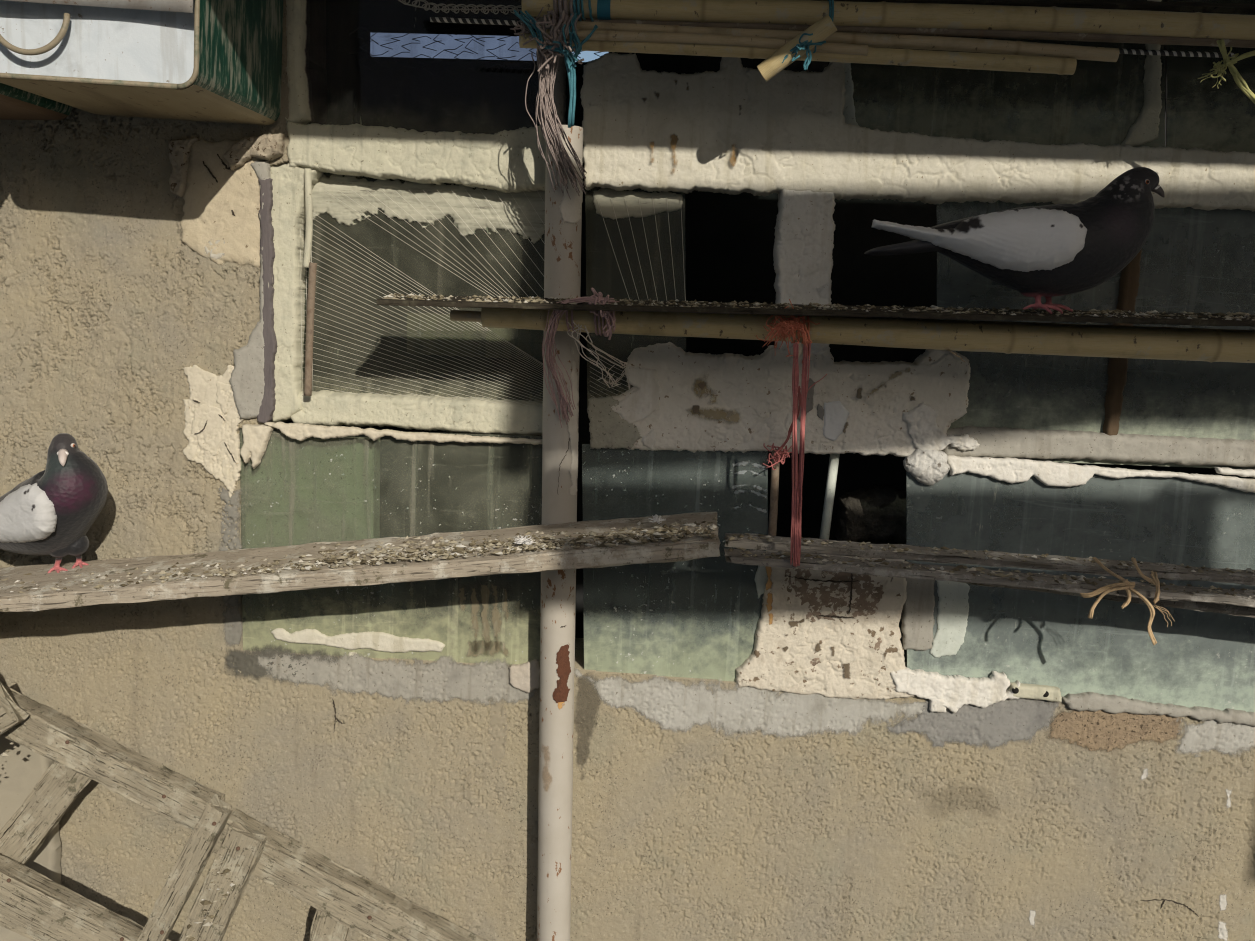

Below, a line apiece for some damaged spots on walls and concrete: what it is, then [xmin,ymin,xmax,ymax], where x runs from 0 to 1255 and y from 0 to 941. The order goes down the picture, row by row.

peeling [183,365,542,498]
spalling [567,347,662,495]
rust [553,644,571,709]
damp [815,643,850,679]
spalling [1050,710,1182,752]